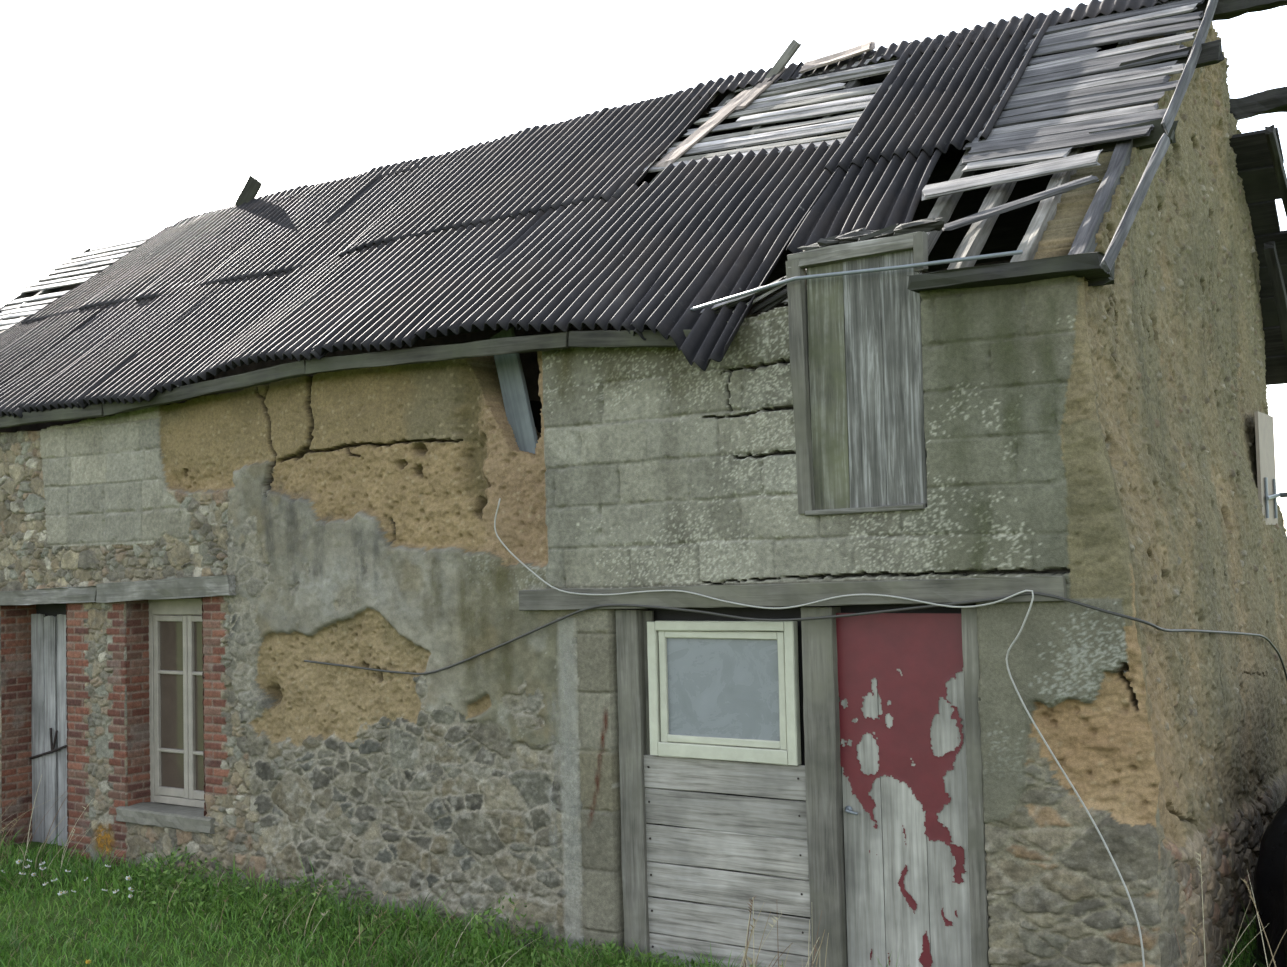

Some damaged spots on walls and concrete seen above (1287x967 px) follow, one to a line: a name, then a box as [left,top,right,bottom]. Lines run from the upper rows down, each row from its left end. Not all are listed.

crack [266,376,463,490]
flaking render [250,607,431,746]
peeling [836,613,966,884]
spalling [1031,625,1160,825]
crack [1119,662,1138,705]
peeling [898,864,917,914]
peeling [918,931,933,967]